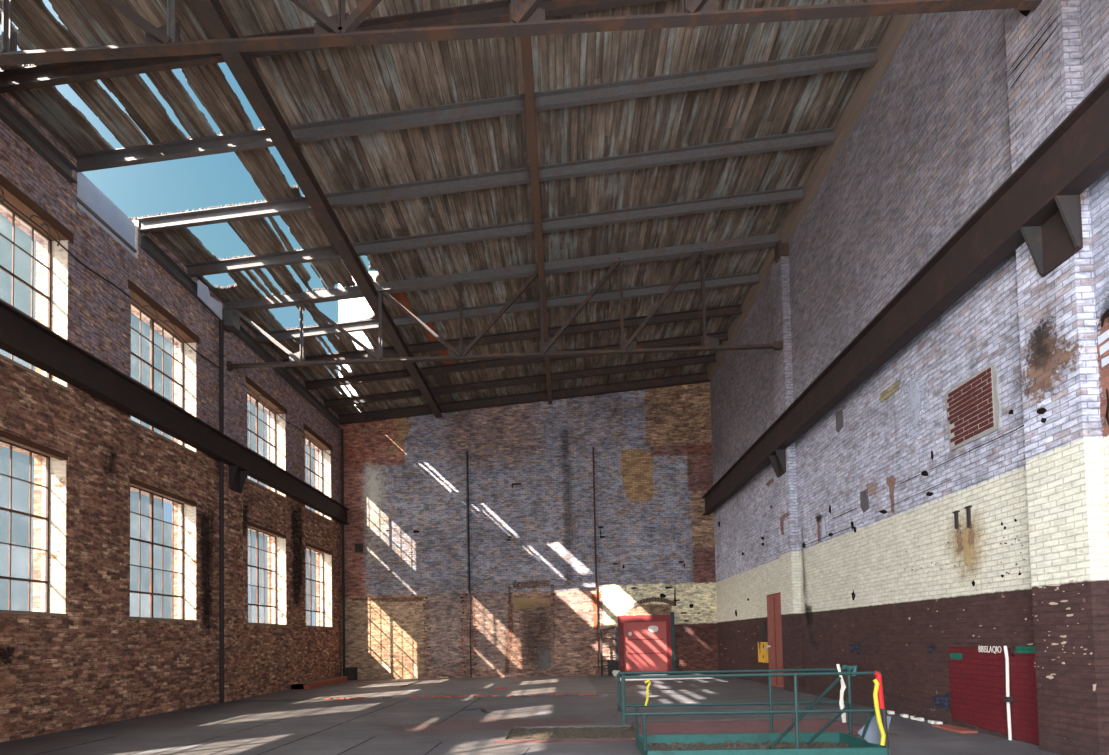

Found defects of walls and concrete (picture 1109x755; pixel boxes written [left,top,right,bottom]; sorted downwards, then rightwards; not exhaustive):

spalling [1017,317,1082,423]
peeling [1095,318,1109,437]
rust [886,476,896,513]
rust [955,524,979,569]